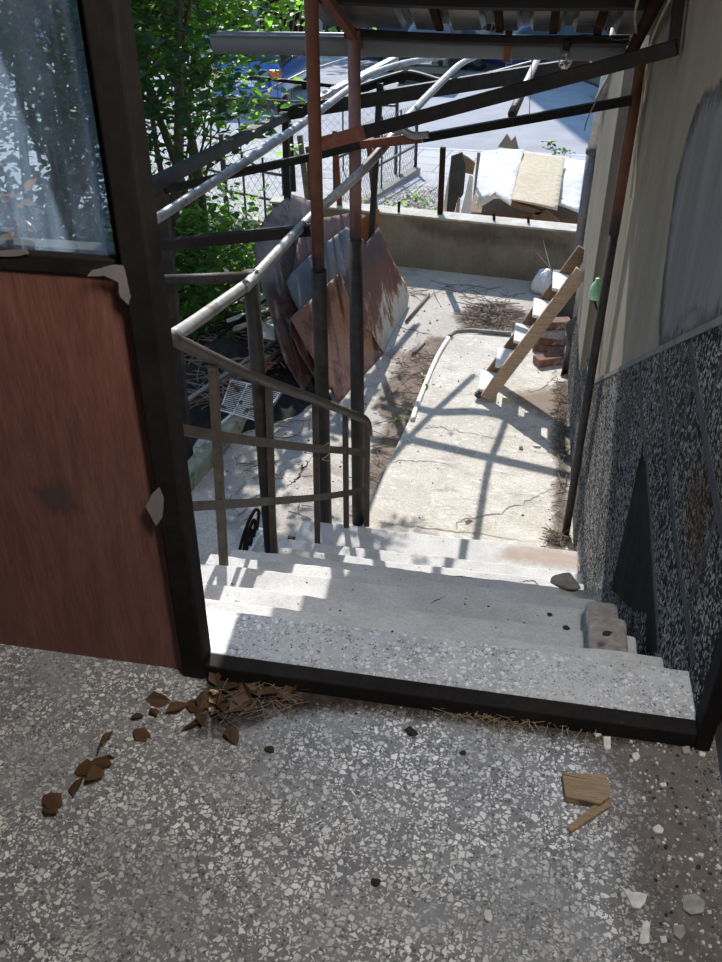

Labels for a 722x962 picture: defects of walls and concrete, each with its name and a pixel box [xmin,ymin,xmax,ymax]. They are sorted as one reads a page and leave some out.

damp [659,80,722,346]
crack [371,487,557,541]
peeling [682,721,722,784]